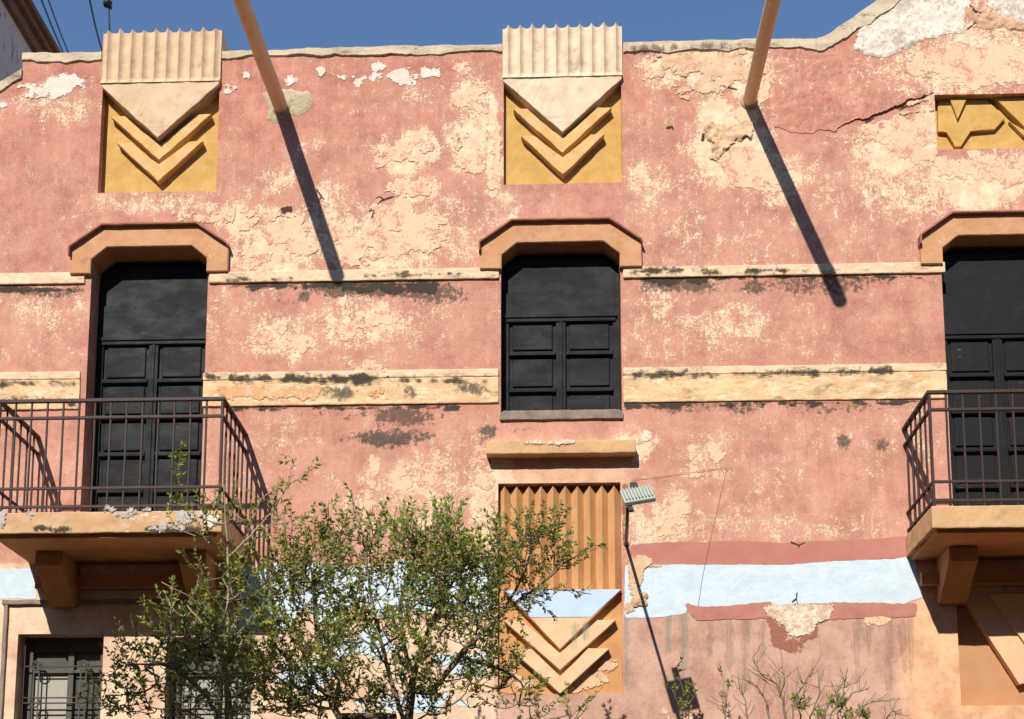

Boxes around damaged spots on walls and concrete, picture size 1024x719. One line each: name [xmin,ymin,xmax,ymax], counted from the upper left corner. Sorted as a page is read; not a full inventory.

peeling [853,0,1024,91]
peeling [17,73,89,99]
peeling [316,60,473,87]
peeling [702,67,796,194]
water stain [226,270,460,301]
mould [624,365,893,378]
water stain [624,402,693,410]
water stain [714,400,823,408]
water stain [852,399,928,407]
water stain [357,432,434,445]
peeling [624,555,666,614]
spalling [686,601,917,637]